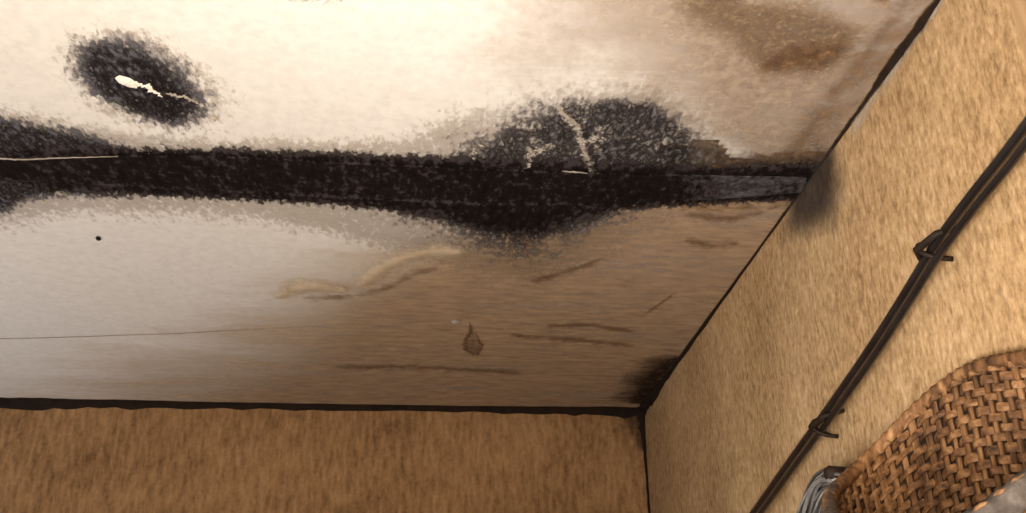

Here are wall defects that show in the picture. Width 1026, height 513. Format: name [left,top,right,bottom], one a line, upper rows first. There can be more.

peeling [115,75,199,105]
leakage [0,0,943,407]